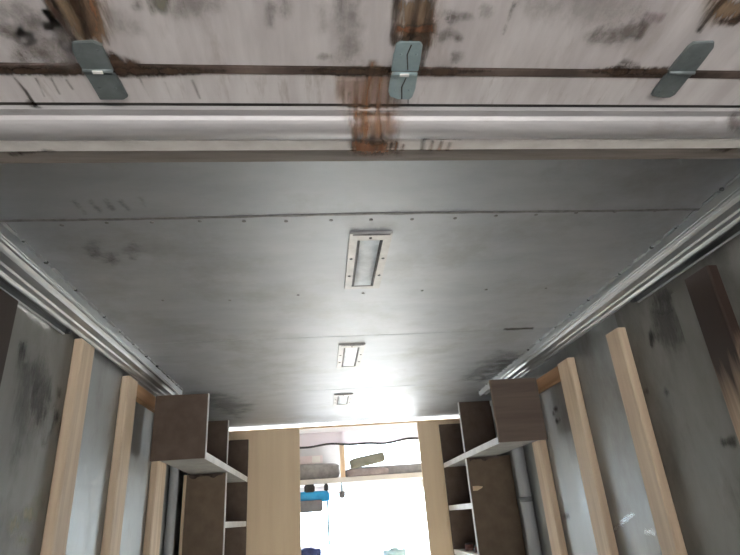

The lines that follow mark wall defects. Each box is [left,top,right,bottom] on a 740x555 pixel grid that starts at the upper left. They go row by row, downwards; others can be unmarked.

corrosion [44,0,107,44]
corrosion [391,0,436,67]
corrosion [352,76,404,155]